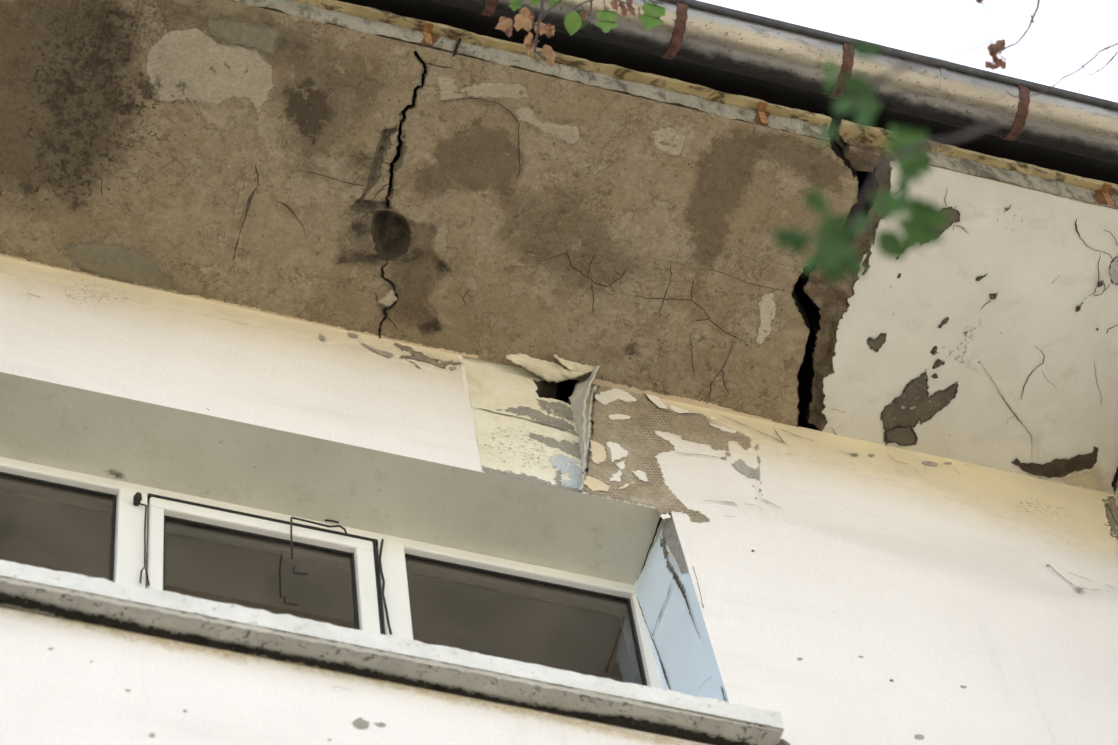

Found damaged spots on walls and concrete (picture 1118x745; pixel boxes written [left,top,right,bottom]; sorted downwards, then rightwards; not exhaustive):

mould [1,0,188,222]
crack [290,38,521,338]
crack [810,114,909,239]
peeling [934,188,969,235]
peeling [1109,256,1118,285]
flaking render [505,353,762,598]
crack [536,253,854,456]
peeling [851,346,959,456]
peeling [1011,446,1098,478]
peeling [1102,480,1118,548]